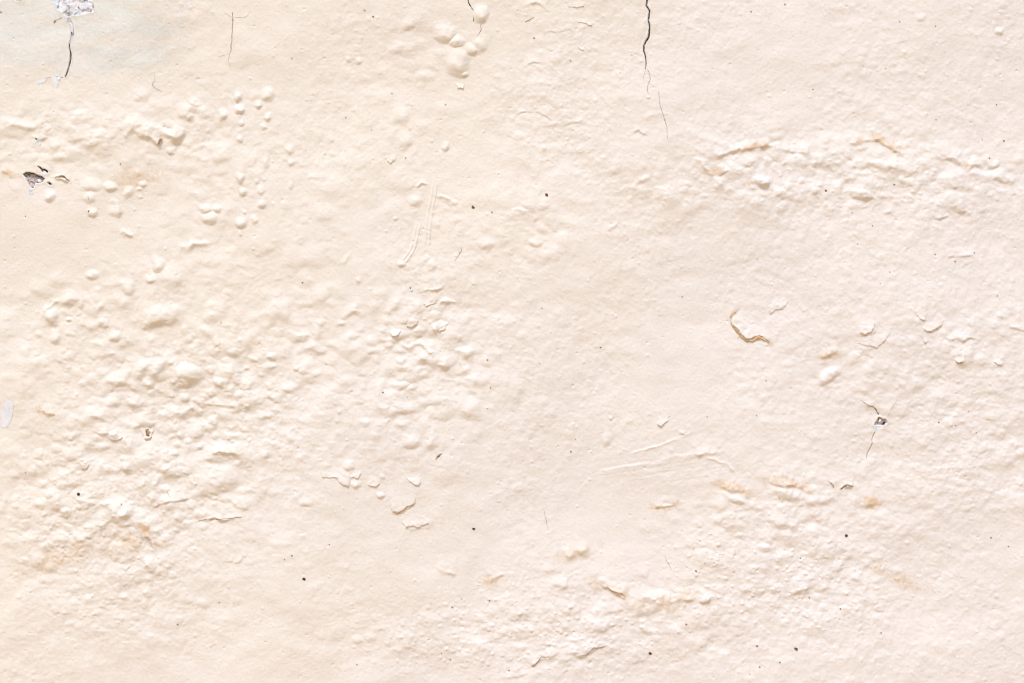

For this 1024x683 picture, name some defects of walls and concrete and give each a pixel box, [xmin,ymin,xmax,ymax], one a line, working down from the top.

spalling [53,0,94,23]
crack [48,16,73,78]
crack [643,0,667,127]
spalling [24,167,52,194]
peeling [730,308,772,344]
peeling [390,474,429,528]